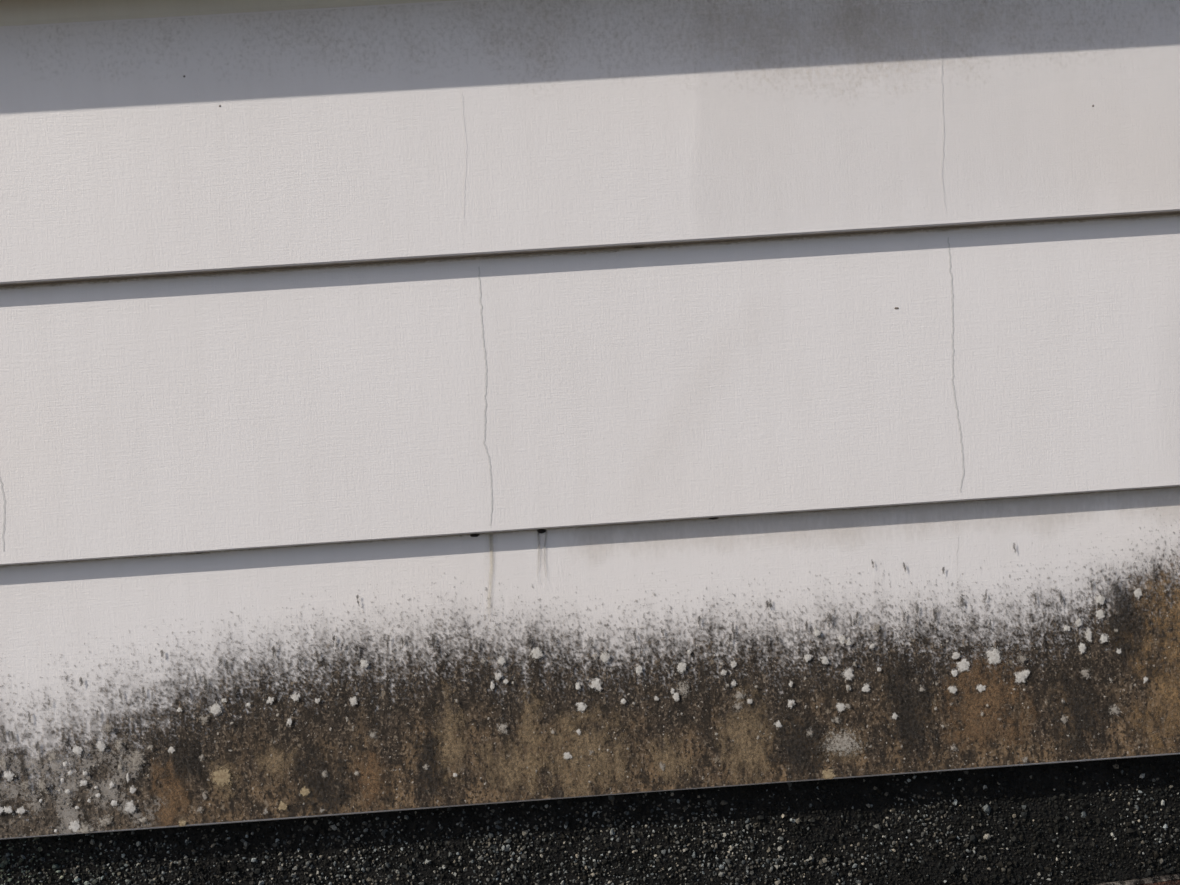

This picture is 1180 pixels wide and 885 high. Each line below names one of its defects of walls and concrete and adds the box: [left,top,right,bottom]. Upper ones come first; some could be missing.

crack [0,479,8,551]
crack [478,266,493,526]
crack [947,237,965,492]
water stain [0,554,1180,838]